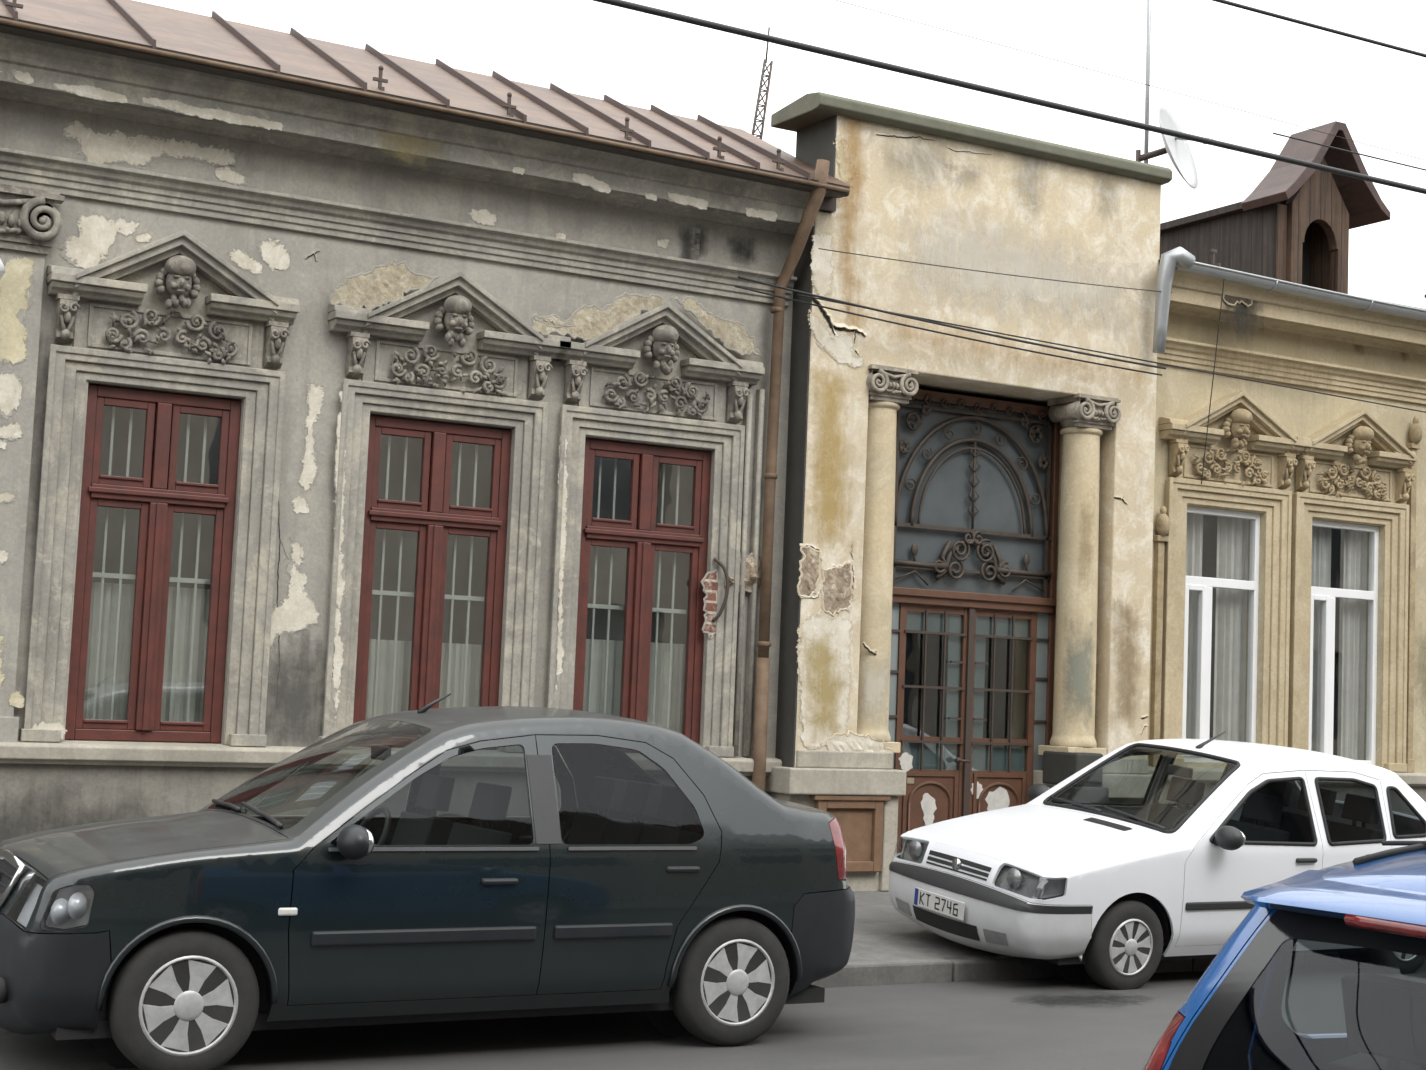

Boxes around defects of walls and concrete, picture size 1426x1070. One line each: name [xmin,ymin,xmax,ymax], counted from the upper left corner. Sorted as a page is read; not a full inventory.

peeling [0,68,34,84]
peeling [52,83,285,131]
peeling [62,118,248,186]
peeling [59,211,152,269]
peeling [228,237,291,274]
flaking render [329,260,440,311]
peeling [0,254,35,449]
peeling [0,550,11,567]
peeling [270,382,349,724]
peeling [0,634,25,708]
peeling [796,546,894,753]
peeling [31,719,67,740]